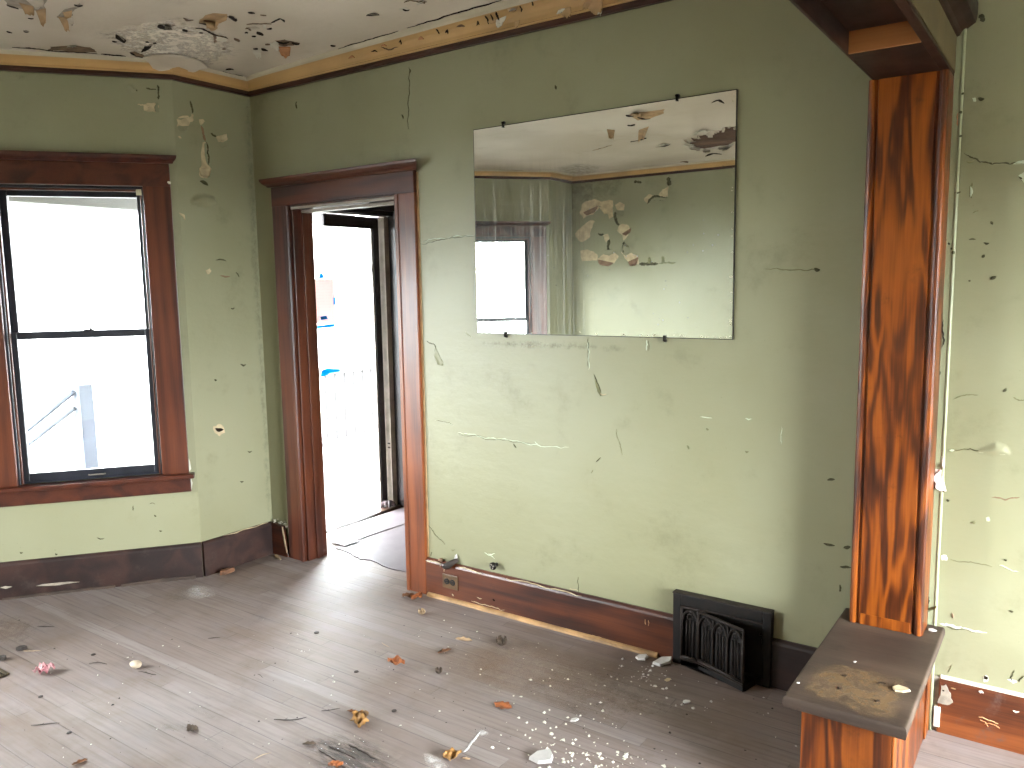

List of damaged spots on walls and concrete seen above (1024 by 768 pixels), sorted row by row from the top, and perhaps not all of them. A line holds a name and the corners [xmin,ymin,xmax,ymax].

peeling [436,2,534,34]
peeling [130,41,157,58]
peeling [163,12,300,59]
peeling [177,101,228,186]
crack [964,153,1024,165]
crack [438,420,564,448]
peeling [934,458,946,492]